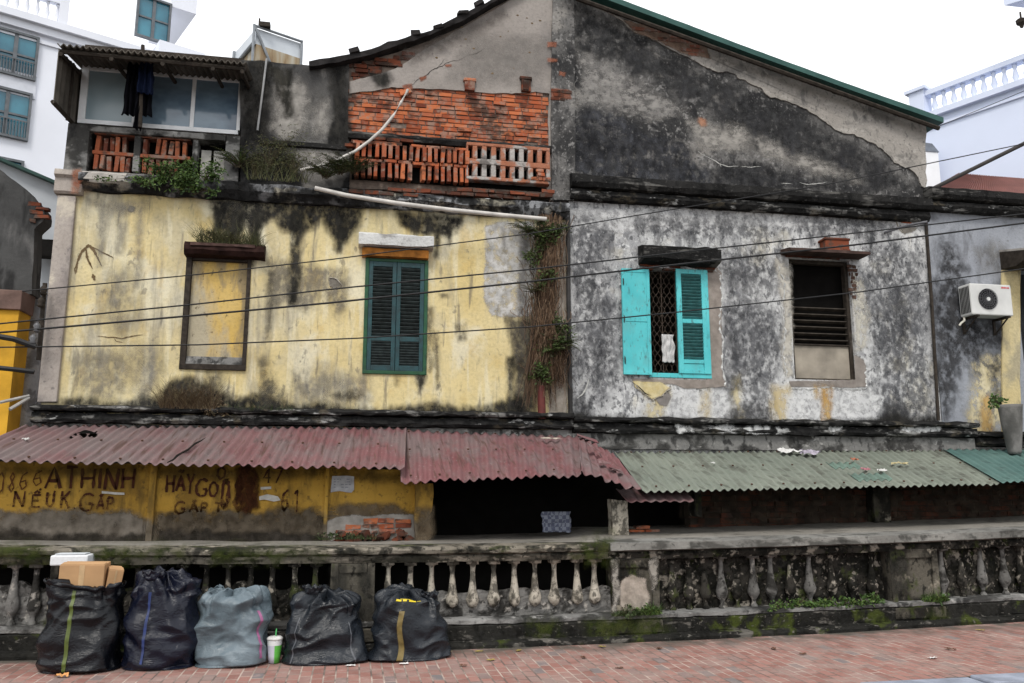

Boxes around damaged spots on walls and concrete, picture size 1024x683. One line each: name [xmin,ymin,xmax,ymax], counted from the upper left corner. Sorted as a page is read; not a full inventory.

leakage [575,7,905,190]
leakage [211,200,362,322]
peeling [632,259,884,434]
spalling [327,514,415,542]